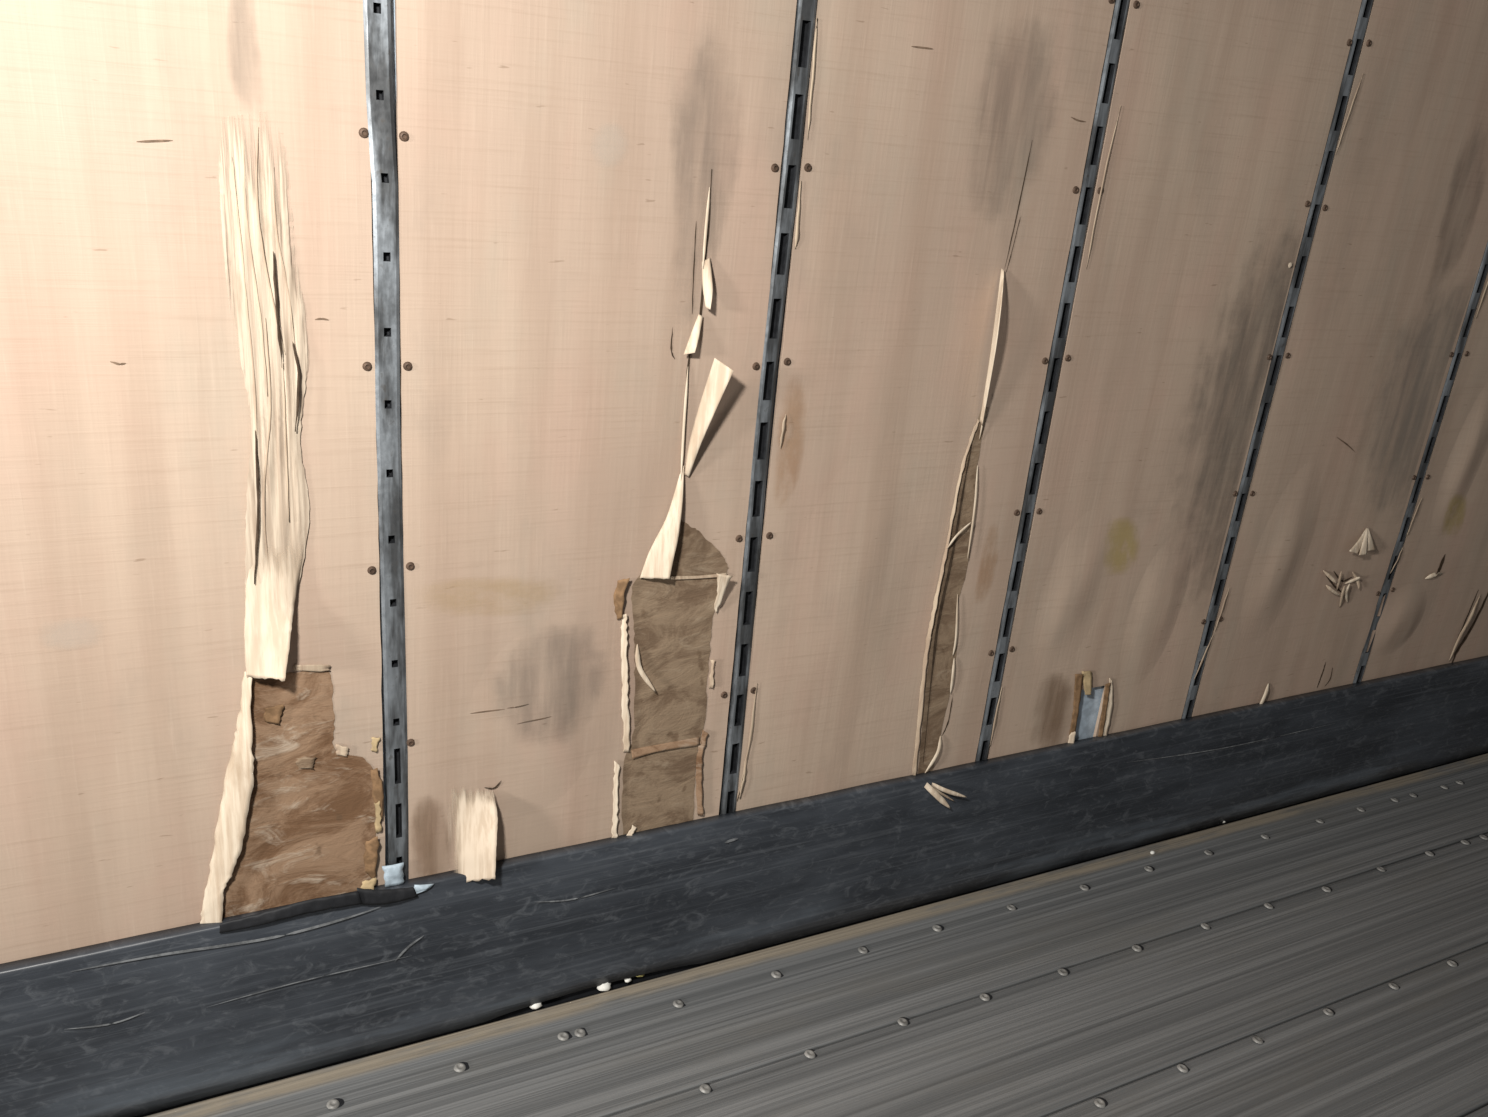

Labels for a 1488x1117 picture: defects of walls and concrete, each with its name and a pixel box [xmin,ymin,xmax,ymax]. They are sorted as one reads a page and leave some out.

peeling [684,258,713,355]
spalling [222,664,384,918]
spalling [611,520,733,838]